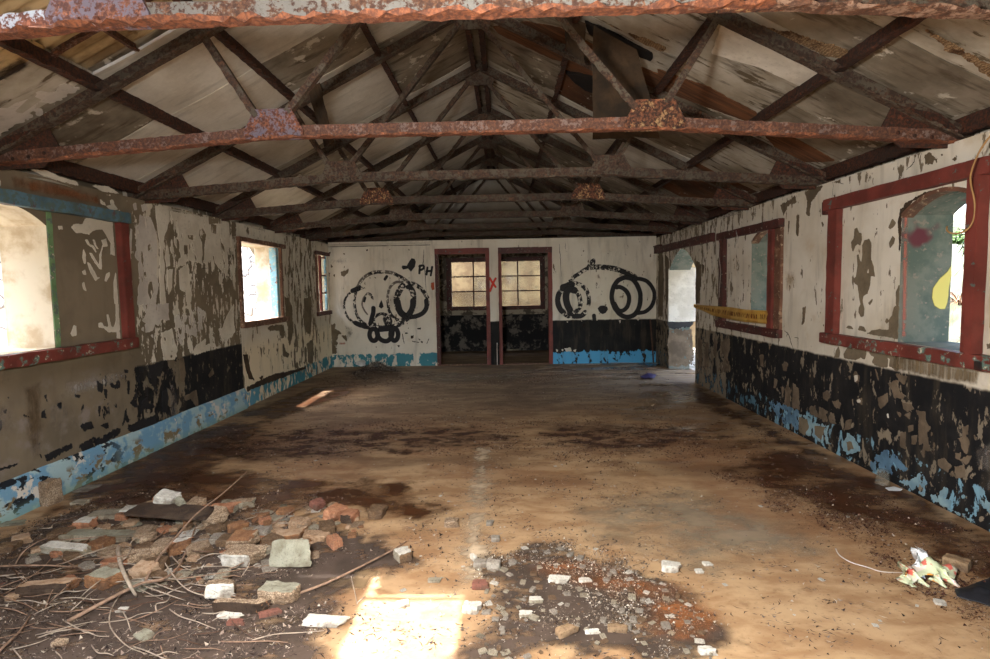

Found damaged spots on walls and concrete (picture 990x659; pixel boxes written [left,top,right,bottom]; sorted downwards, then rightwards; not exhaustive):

peeling [765,136,834,162]
peeling [924,152,956,165]
peeling [780,185,823,236]
peeling [243,296,314,392]
peeling [769,361,860,454]
peeling [835,347,990,523]